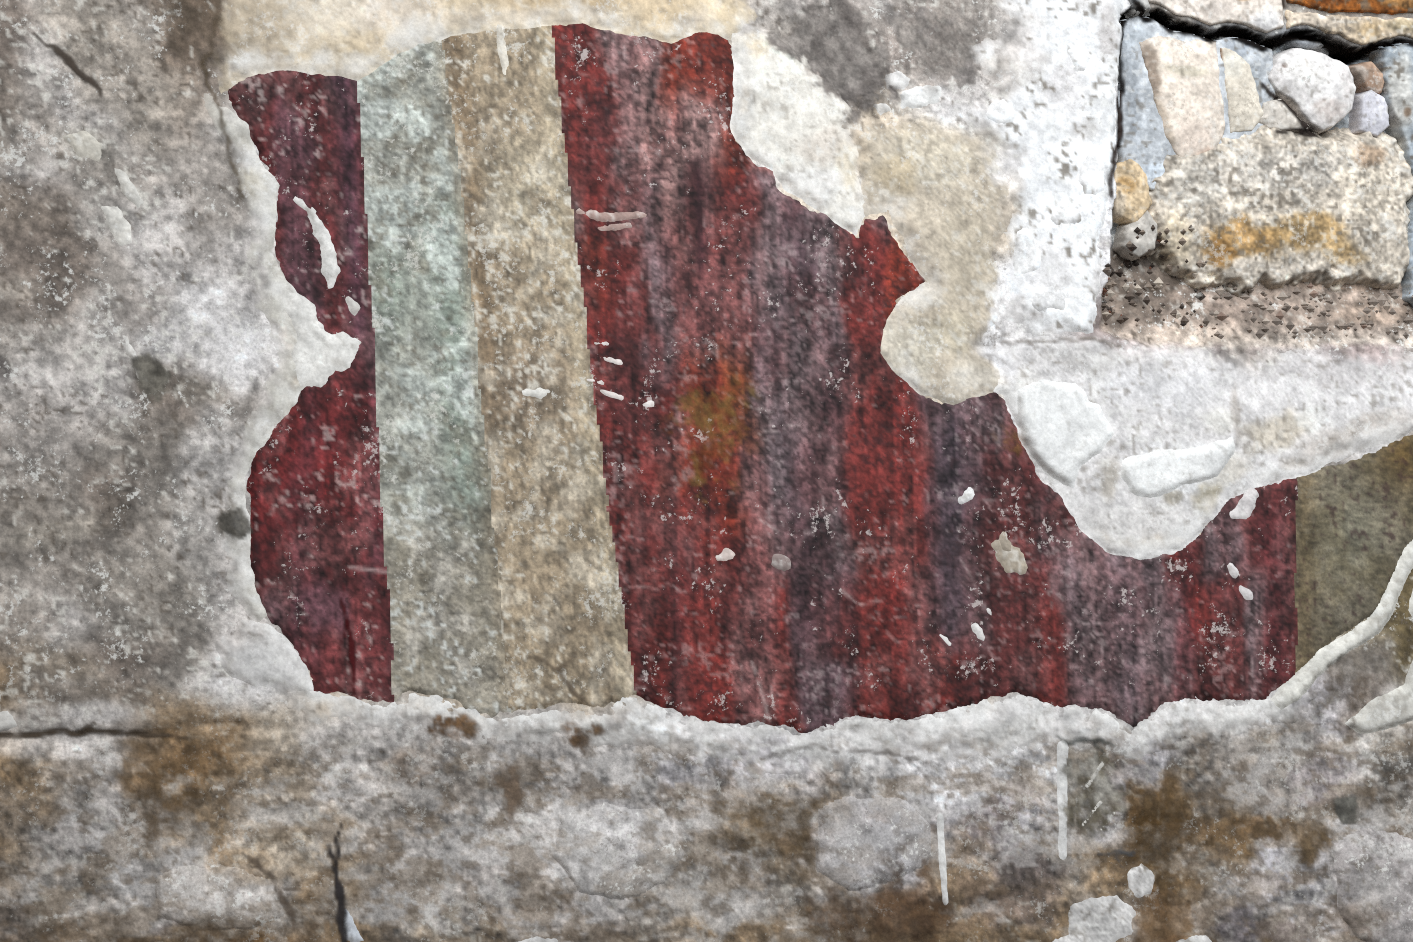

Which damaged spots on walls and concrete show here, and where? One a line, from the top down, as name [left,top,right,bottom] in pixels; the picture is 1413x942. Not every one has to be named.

crack [1108,0,1413,197]
peeling [767,0,1413,560]
peeling [1227,563,1253,600]
water stain [1321,648,1398,704]
crack [0,722,188,739]
water stain [504,766,524,820]
crack [329,823,347,942]